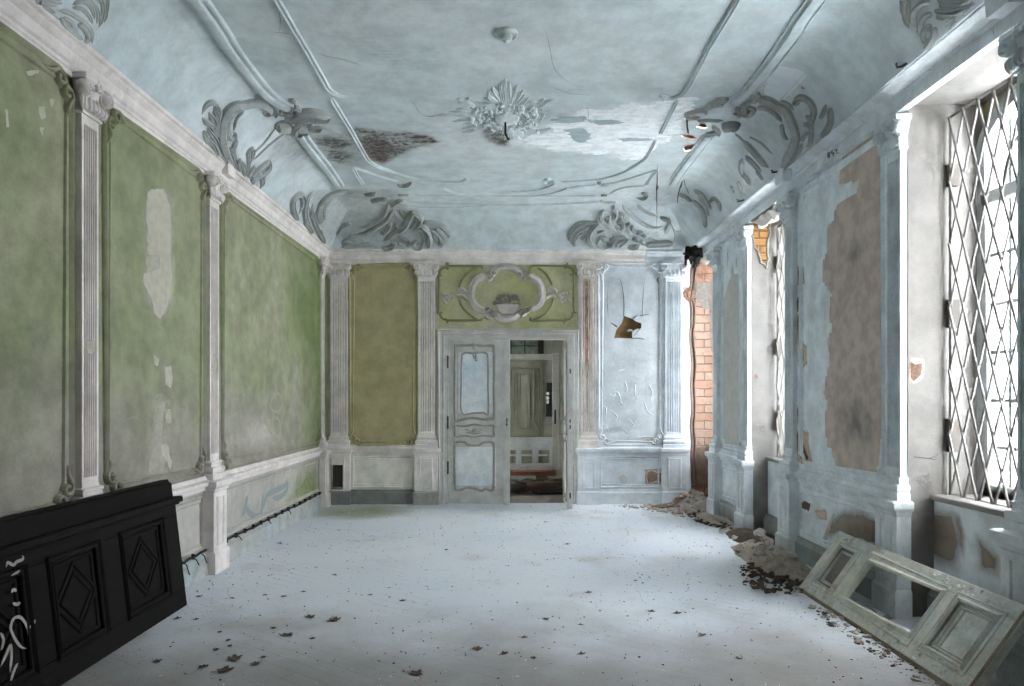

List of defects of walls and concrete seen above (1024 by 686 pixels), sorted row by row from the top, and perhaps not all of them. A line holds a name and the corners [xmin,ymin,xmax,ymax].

peeling [522,97,707,161]
peeling [143,188,175,319]
flaking render [750,203,781,269]
flaking render [611,279,647,340]
peeling [823,135,881,472]
peeling [154,355,173,388]
spalling [910,358,924,384]
flaking render [645,469,661,484]